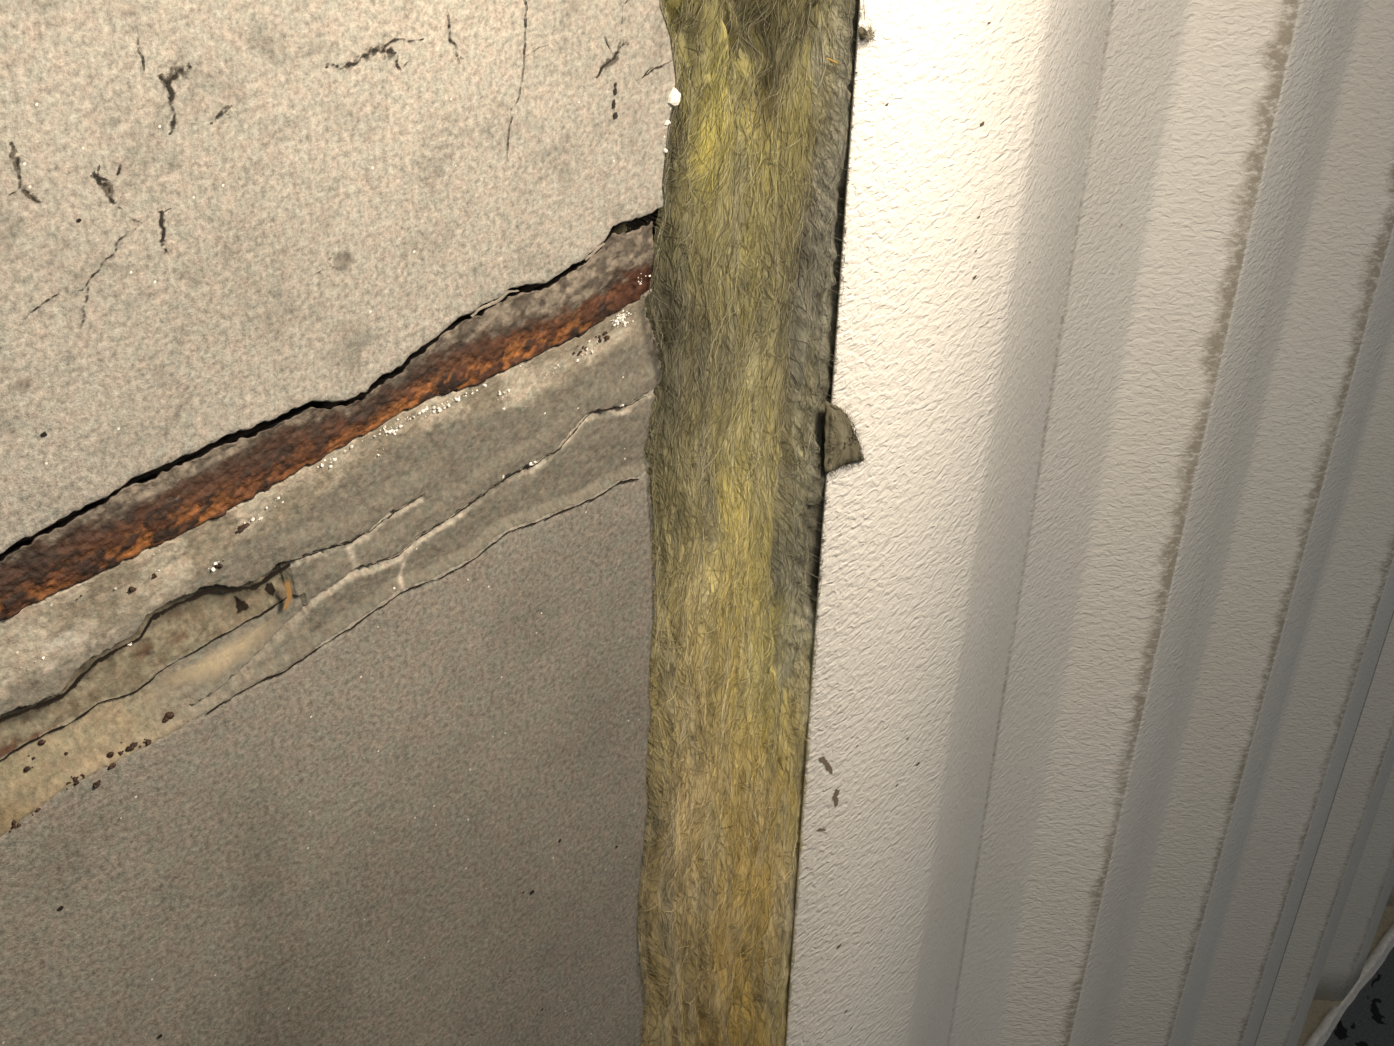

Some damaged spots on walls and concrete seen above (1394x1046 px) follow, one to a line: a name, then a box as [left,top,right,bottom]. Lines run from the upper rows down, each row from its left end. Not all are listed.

crack [326,10,464,71]
crack [507,0,540,159]
corrosion [283,581,292,610]
crack [0,395,649,761]
spalling [0,209,662,837]